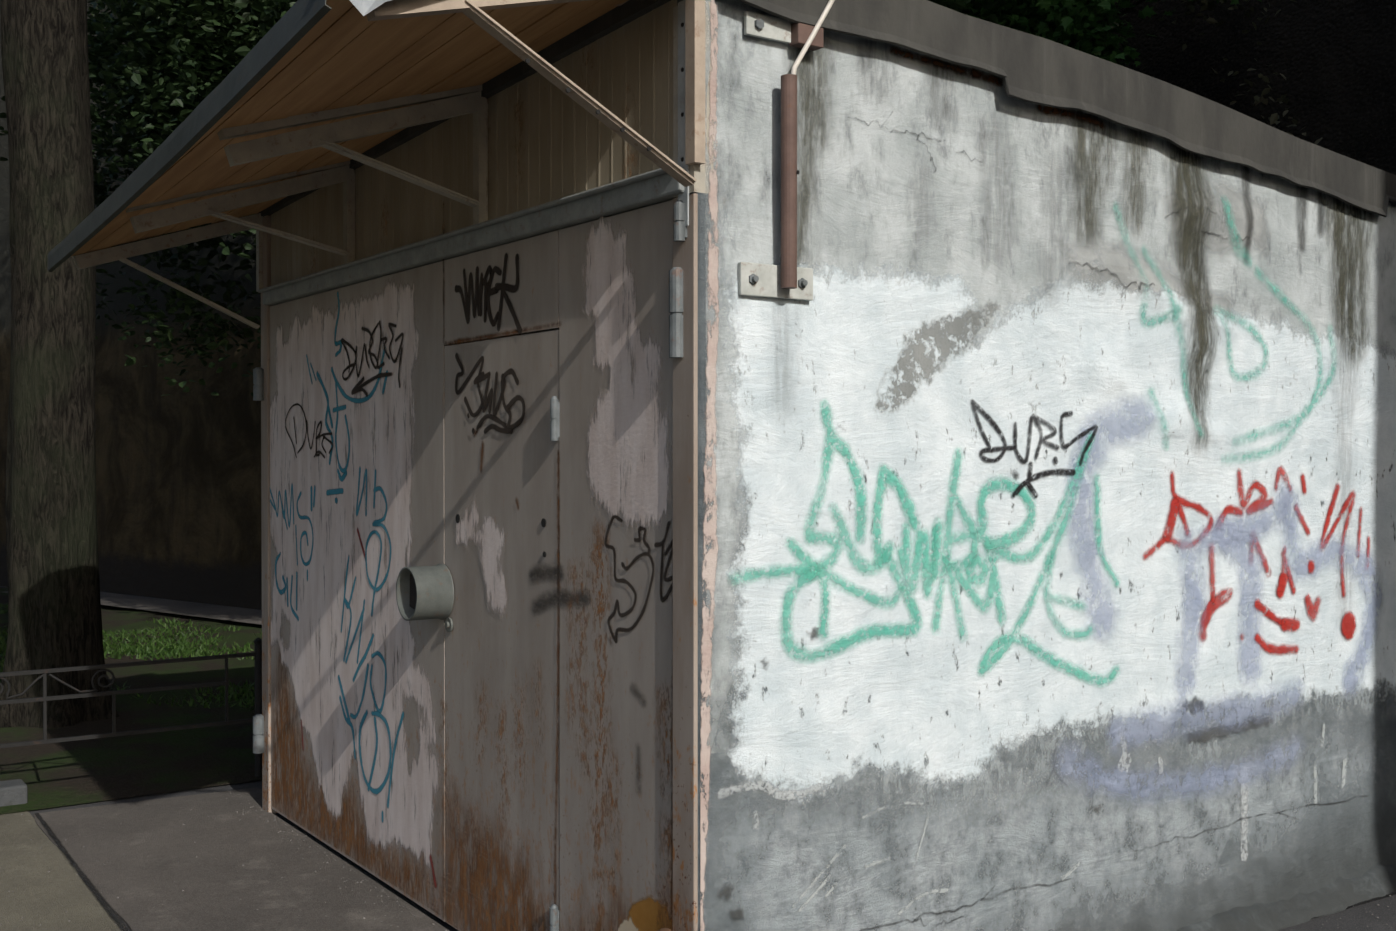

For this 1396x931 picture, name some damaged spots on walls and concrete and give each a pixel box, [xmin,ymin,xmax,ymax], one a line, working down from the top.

leakage [1074,110,1111,237]
leakage [1129,129,1147,225]
leakage [1174,145,1209,441]
leakage [1243,166,1253,260]
leakage [1299,187,1372,357]
rust [272,664,438,914]
rust [554,451,673,931]
leakage [1117,732,1131,774]
leakage [1240,765,1248,861]